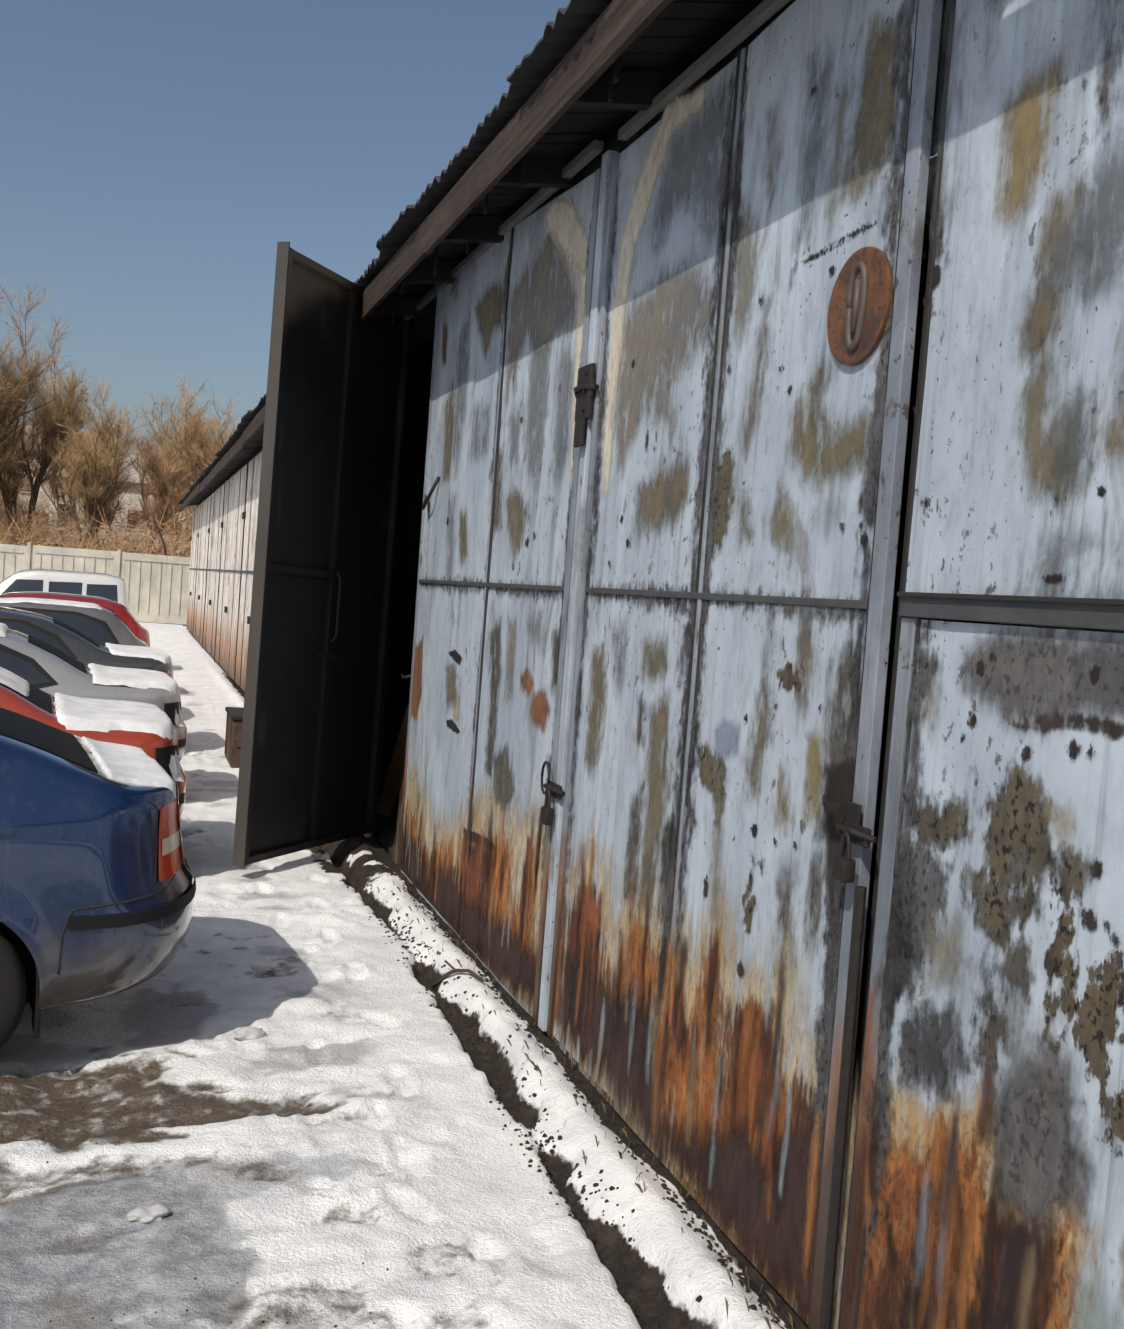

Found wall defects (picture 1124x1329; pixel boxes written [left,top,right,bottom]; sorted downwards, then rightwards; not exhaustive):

rust [411,640,423,720]
spalling [961,711,976,742]
spalling [1067,739,1096,760]
peeling [912,794,968,852]
rust [1090,858,1103,879]
peeling [961,746,1094,1072]
rust [396,759,856,1325]
rust [1072,909,1124,1157]
rust [831,843,1095,1329]